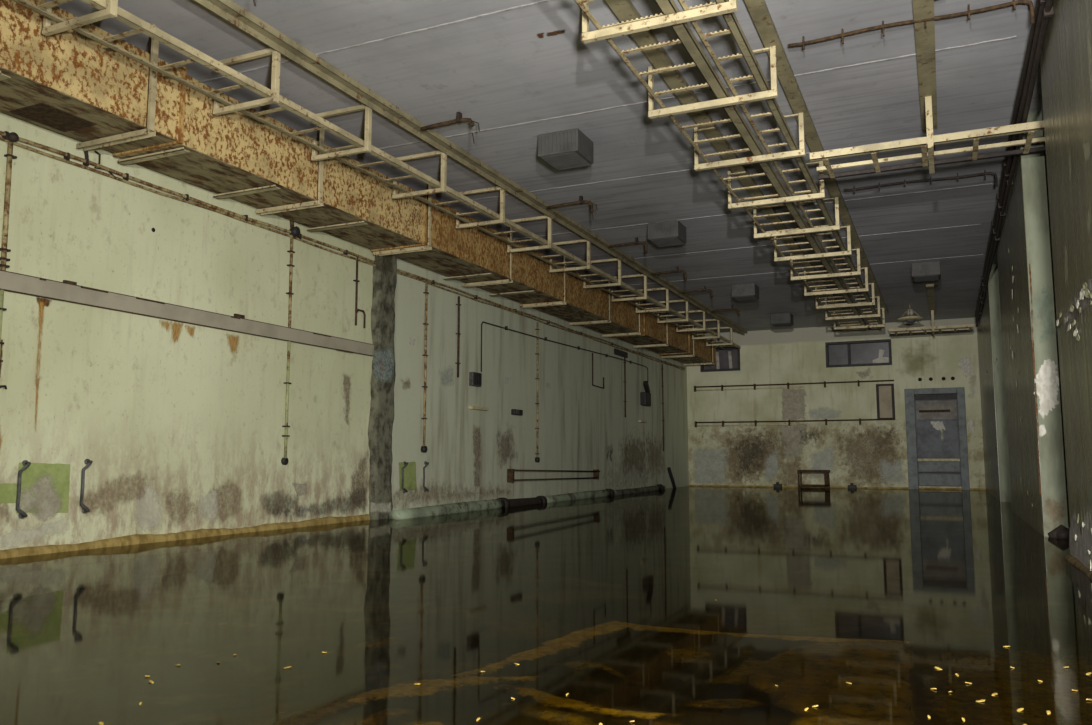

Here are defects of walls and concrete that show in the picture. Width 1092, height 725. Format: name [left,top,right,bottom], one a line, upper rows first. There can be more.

damp [375,254,392,273]
peeling [1056,277,1092,341]
rust [0,270,374,420]
peeling [1034,358,1059,437]
damp [264,459,397,514]
peeling [1069,507,1092,571]